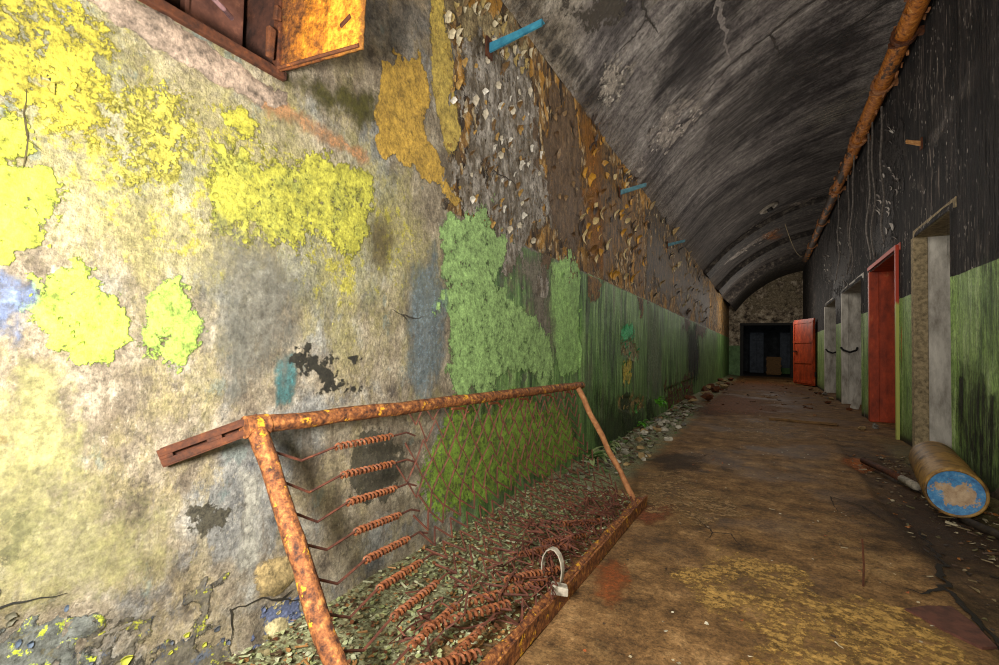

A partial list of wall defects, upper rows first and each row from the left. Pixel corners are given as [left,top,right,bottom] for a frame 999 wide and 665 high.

crack [611,0,659,63]
water stain [289,82,375,128]
water stain [371,223,392,266]
flaking render [373,0,714,523]
water stain [218,246,363,397]
water stain [16,368,69,467]
water stain [348,427,405,505]
water stain [0,507,40,566]
crack [0,589,66,609]
water stain [184,502,232,539]
water stain [239,472,257,568]
crack [800,487,999,650]